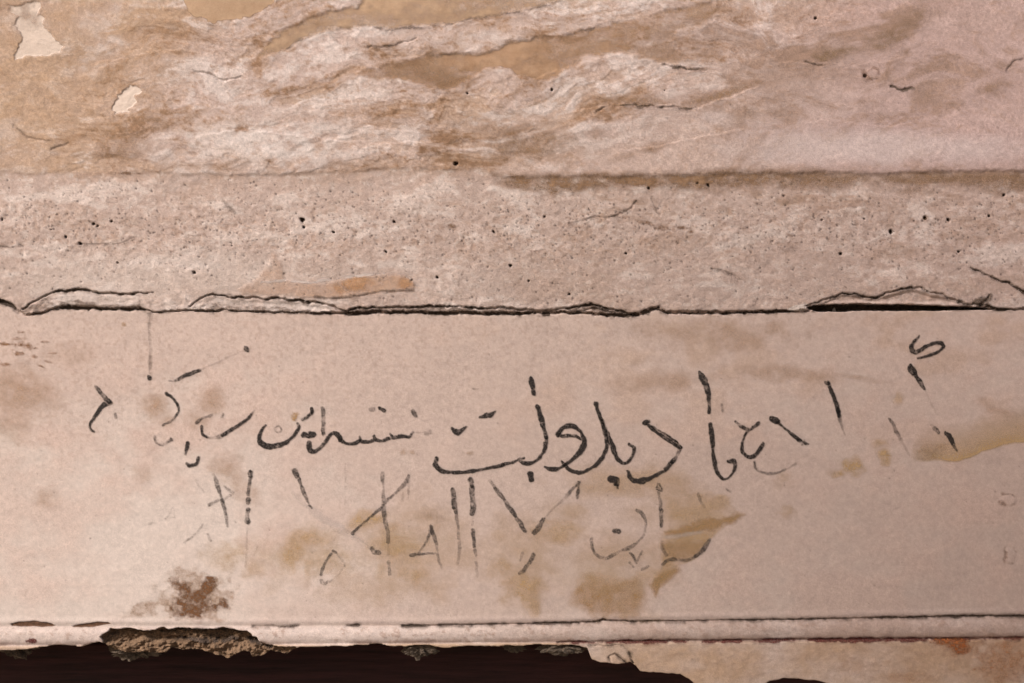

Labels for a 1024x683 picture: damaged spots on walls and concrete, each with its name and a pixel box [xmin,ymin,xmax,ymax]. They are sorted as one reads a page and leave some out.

peeling [11,2,63,60]
peeling [184,0,274,24]
peeling [263,0,557,53]
peeling [373,23,666,89]
peeling [112,85,142,114]
crack [0,288,162,315]
crack [202,268,1024,318]
water stain [166,575,228,618]